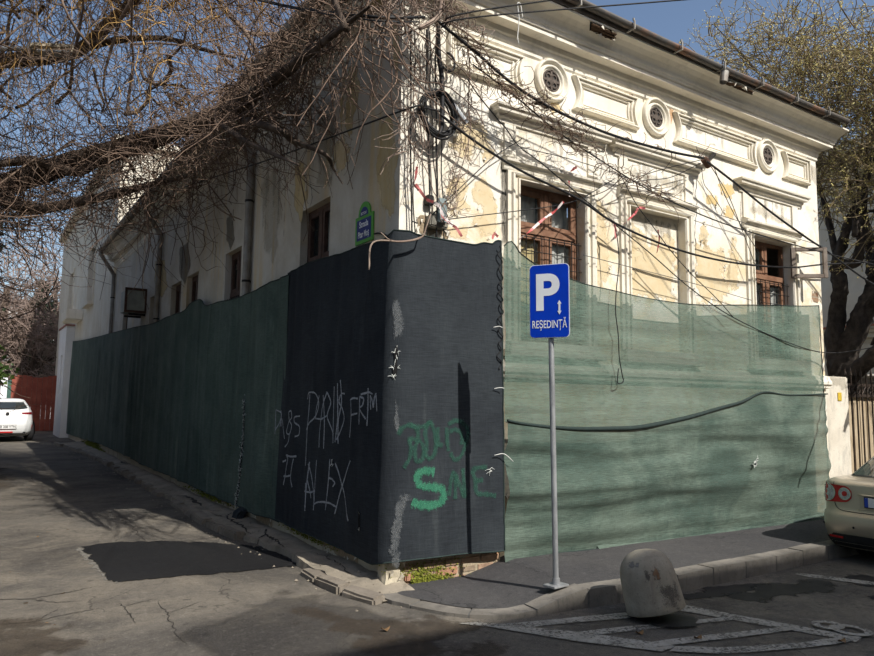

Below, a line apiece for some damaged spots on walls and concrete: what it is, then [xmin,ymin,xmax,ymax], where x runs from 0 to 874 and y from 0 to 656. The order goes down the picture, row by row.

peeling [448,120,494,165]
peeling [417,174,498,240]
peeling [706,183,735,220]
peeling [596,201,611,287]
peeling [695,221,739,305]